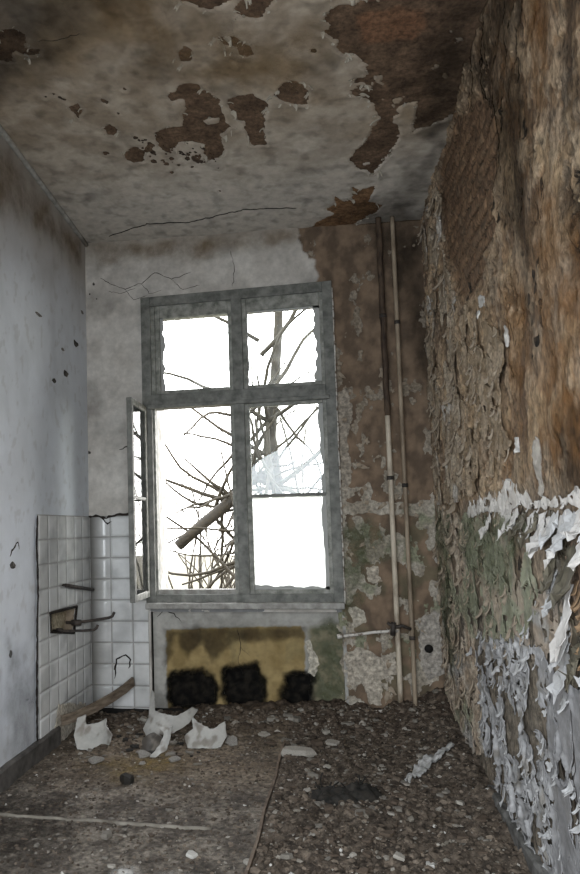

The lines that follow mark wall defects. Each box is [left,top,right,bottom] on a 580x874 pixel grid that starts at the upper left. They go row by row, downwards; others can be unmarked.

peeling [174,0,277,22]
peeling [0,26,41,65]
peeling [172,46,194,71]
peeling [208,36,254,59]
peeling [100,124,119,137]
peeling [120,81,313,174]
crack [109,207,296,237]
peeling [312,0,580,874]
damp [169,629,260,654]
crack [570,710,580,834]